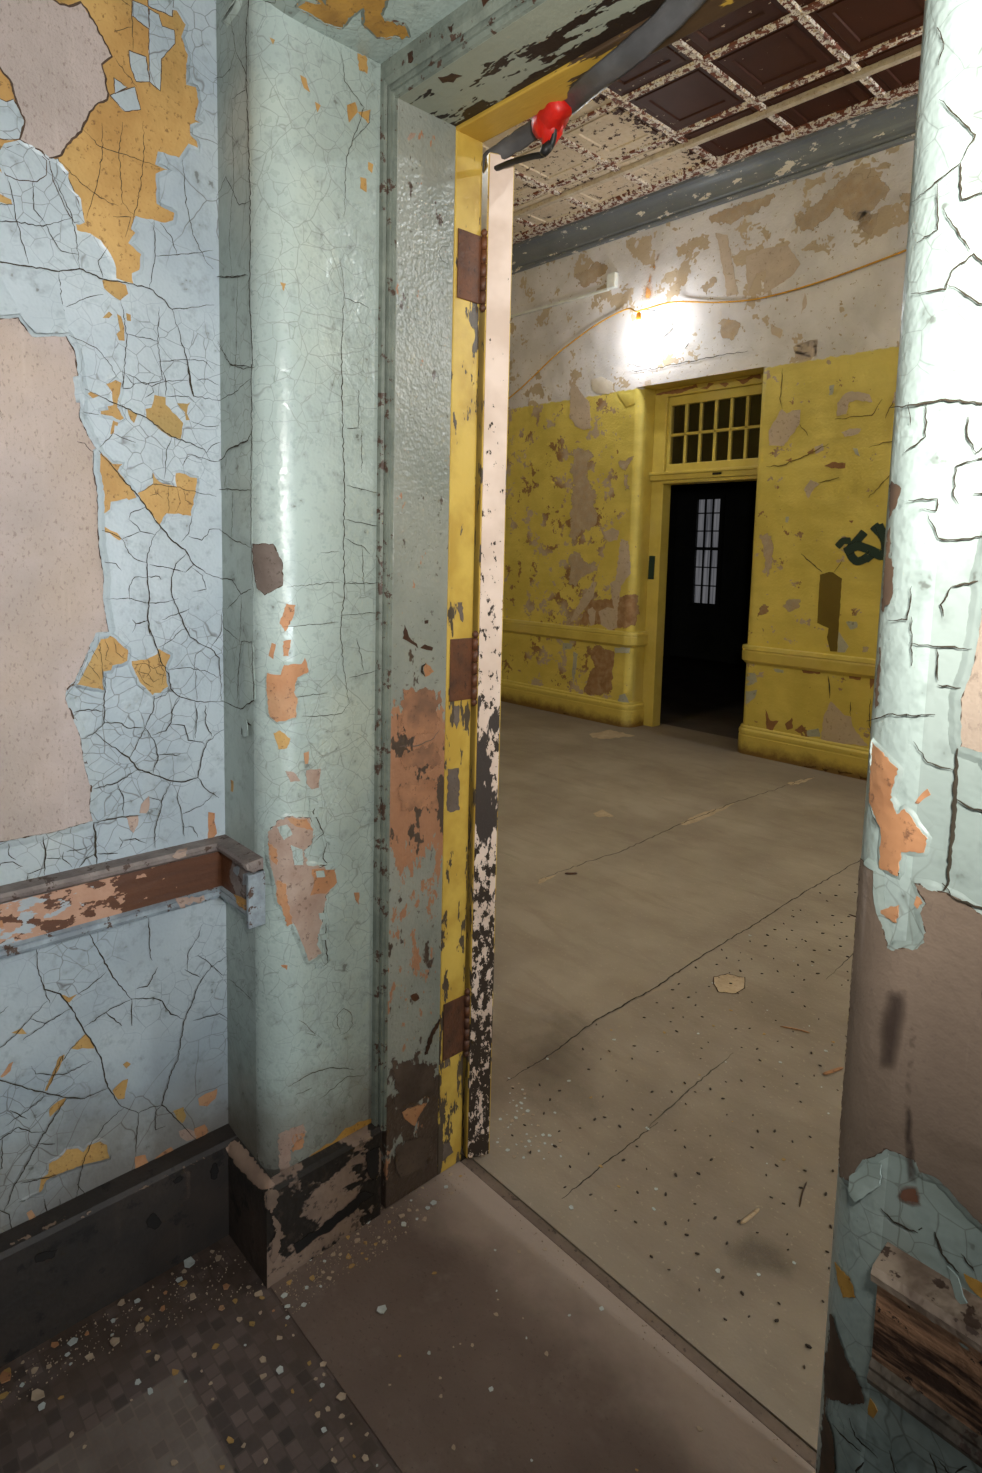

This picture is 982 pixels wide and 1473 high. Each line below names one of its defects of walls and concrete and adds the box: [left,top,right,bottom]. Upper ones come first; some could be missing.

peeling [0,0,203,341]
peeling [295,0,413,63]
crack [911,27,982,305]
flaking render [0,264,200,849]
crack [0,0,276,881]
peeling [252,543,321,789]
crack [766,368,982,541]
crack [828,581,982,909]
flaking render [948,531,982,771]
peeling [229,813,339,970]
crack [0,923,250,1229]
peeling [816,1314,878,1473]